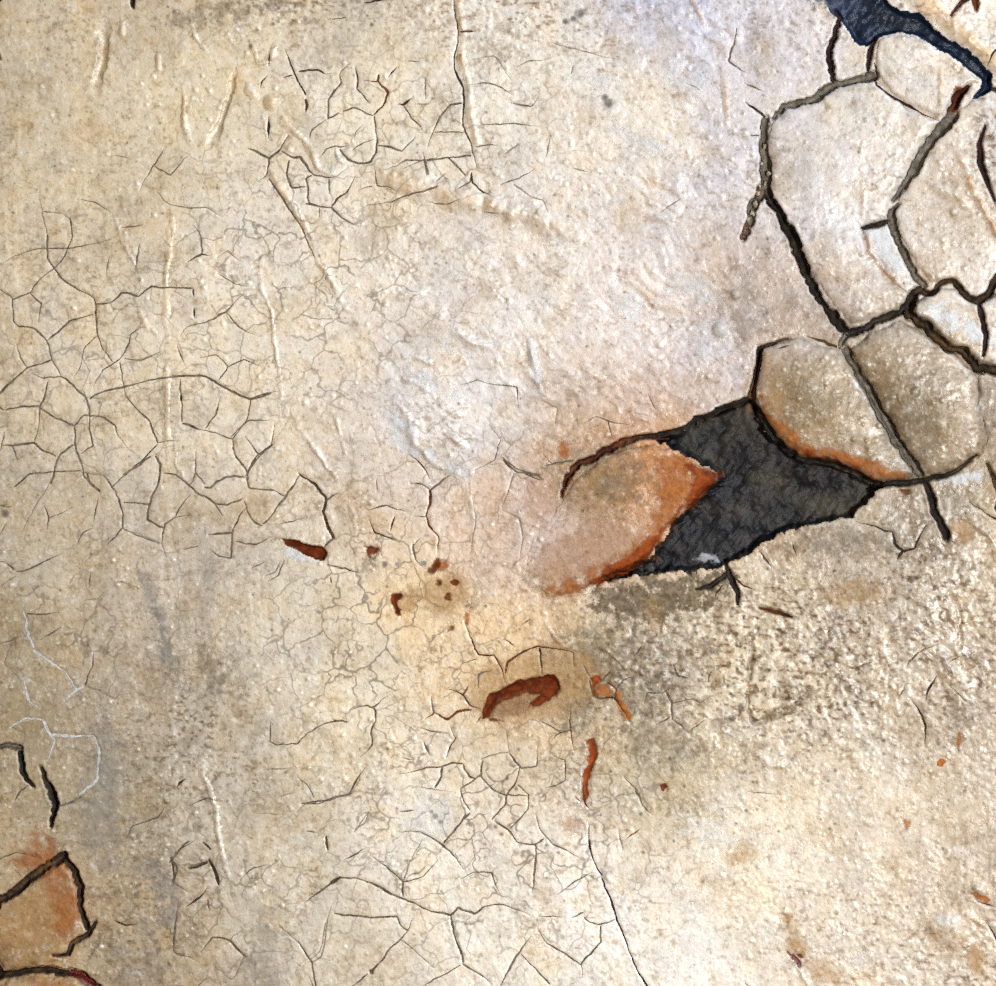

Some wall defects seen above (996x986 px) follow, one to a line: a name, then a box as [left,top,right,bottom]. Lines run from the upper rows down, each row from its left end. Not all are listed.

crack [950,0,979,17]
crack [0,147,358,827]
spalling [282,538,328,561]
corrosion [391,592,415,616]
crack [365,455,450,567]
corrosion [421,558,459,600]
spalling [524,401,883,597]
corrosion [591,675,632,720]
crack [251,618,712,986]
corrosion [582,738,598,800]
crack [0,852,132,986]
crack [169,841,246,986]